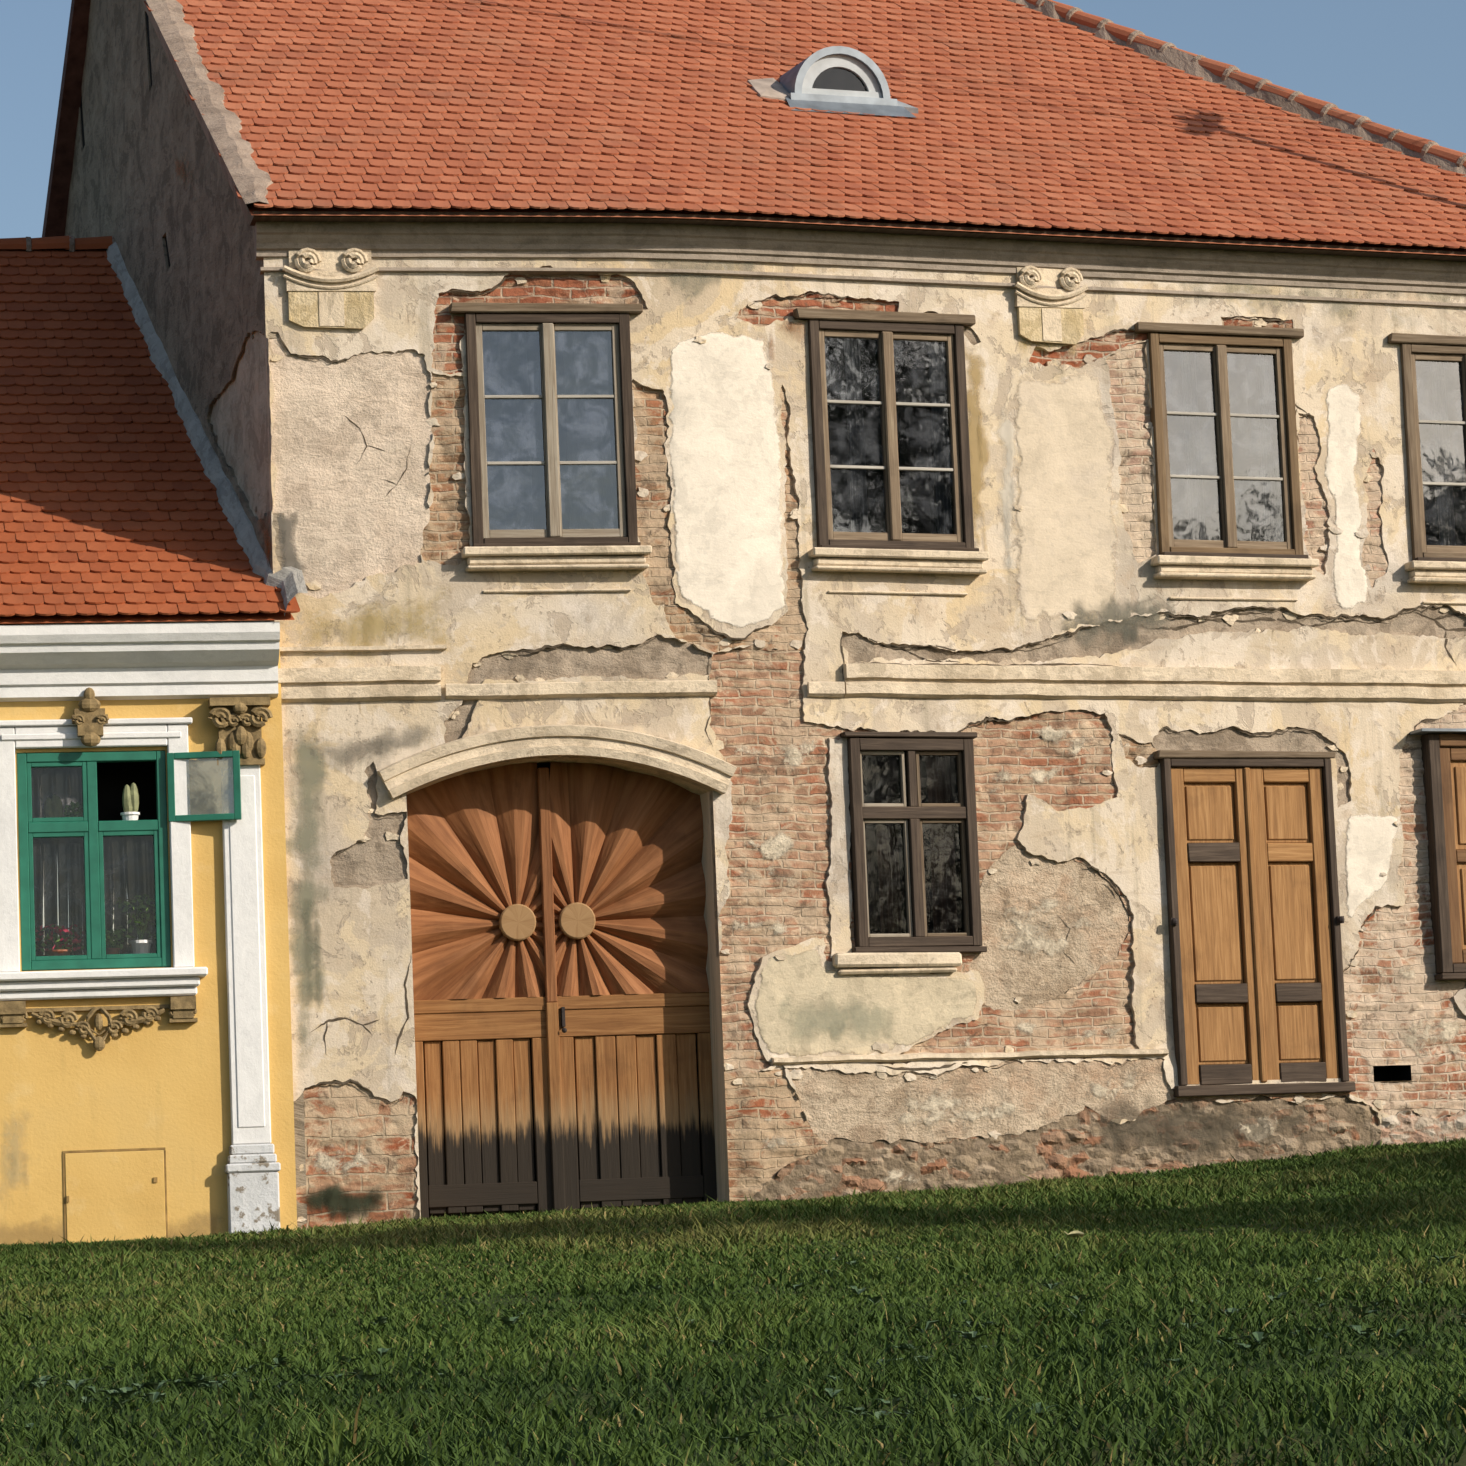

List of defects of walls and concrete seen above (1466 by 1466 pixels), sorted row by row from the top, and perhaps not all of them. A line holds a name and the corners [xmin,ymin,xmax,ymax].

flaking render [737,291,898,326]
crack [344,415,411,498]
spalling [208,266,646,599]
flaking render [1029,328,1156,563]
damp [292,742,324,996]
flaking render [444,380,1466,1202]
crack [310,953,412,1057]
flaking render [294,1079,420,1230]